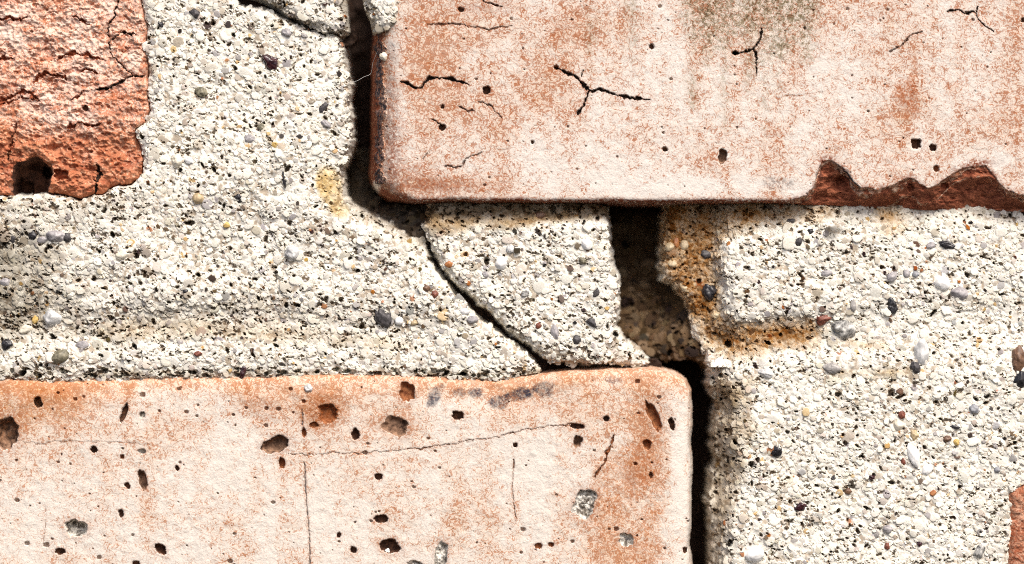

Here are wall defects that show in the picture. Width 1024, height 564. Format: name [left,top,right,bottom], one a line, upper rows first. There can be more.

crack [948,6,994,32]
crack [96,0,143,91]
crack [732,28,763,74]
crack [401,76,502,127]
crack [558,68,644,115]
spalling [794,160,1024,213]
crack [430,250,621,371]